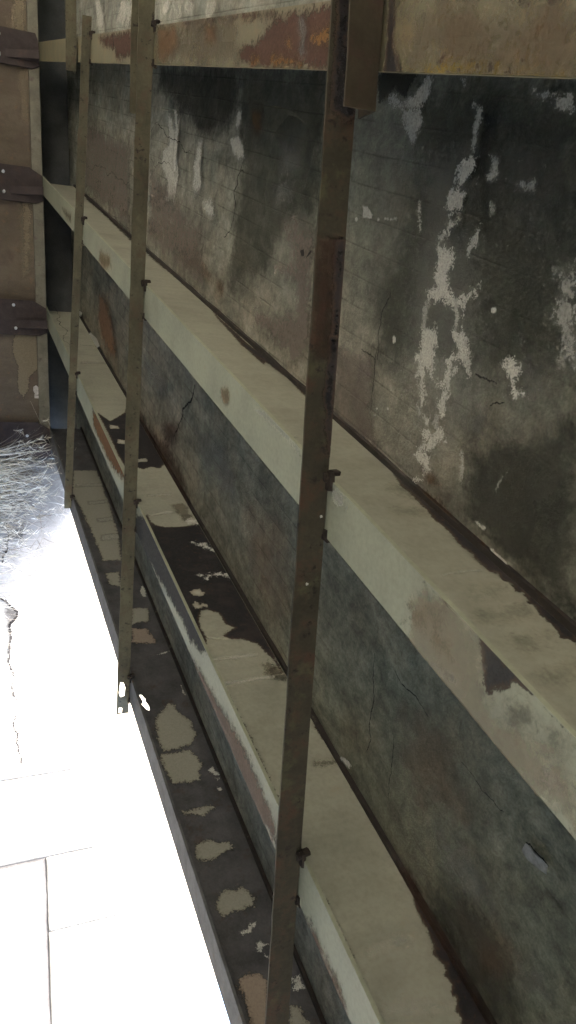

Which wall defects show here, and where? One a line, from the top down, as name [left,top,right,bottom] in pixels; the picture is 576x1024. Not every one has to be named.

corrosion [100,29,131,60]
corrosion [184,10,275,37]
water stain [531,88,575,115]
water stain [159,66,244,203]
water stain [412,102,506,484]
water stain [501,355,525,400]
crack [173,385,195,438]
peeling [136,514,230,654]
spalling [522,843,548,874]